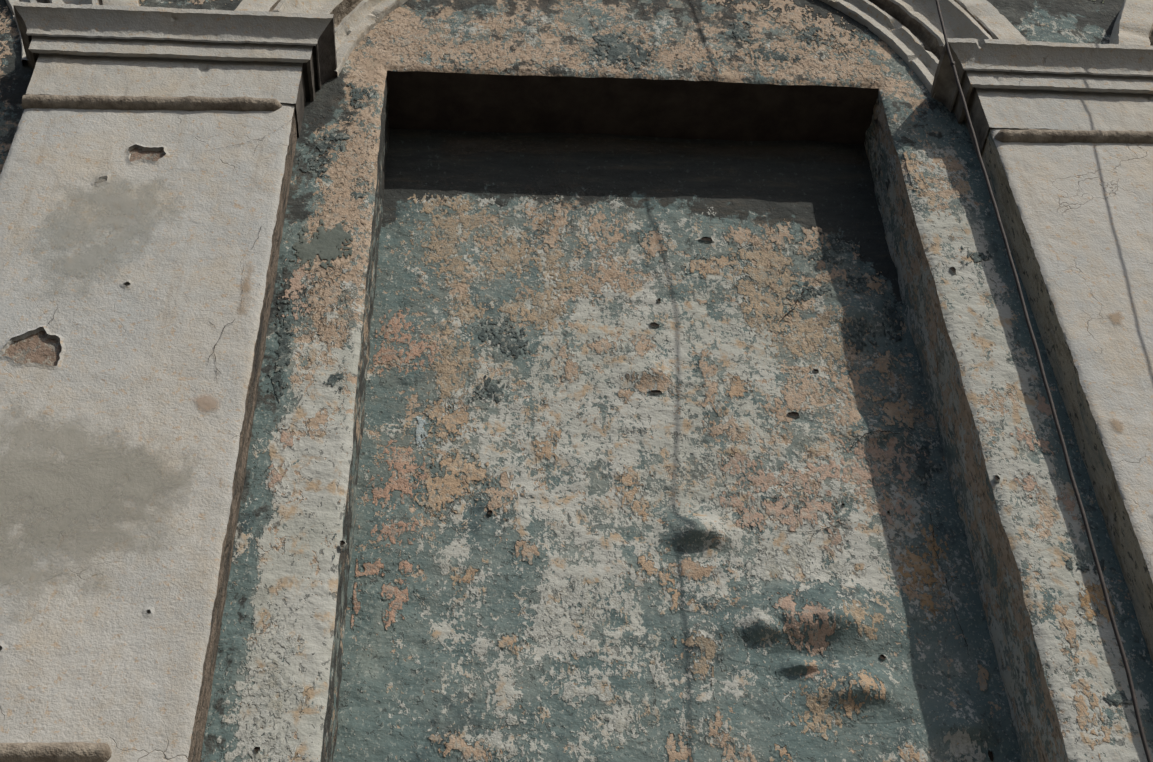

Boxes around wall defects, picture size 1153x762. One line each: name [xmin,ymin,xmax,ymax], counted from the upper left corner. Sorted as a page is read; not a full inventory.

peeling [0,5,17,74]
peeling [370,21,606,69]
peeling [647,0,889,84]
spalling [125,143,170,165]
peeling [312,107,376,243]
spalling [0,325,66,370]
peeling [350,193,682,631]
peeling [489,207,958,740]
peeling [1012,469,1080,524]
peeling [217,602,318,762]
peeling [1053,577,1121,759]
peeling [426,713,527,762]